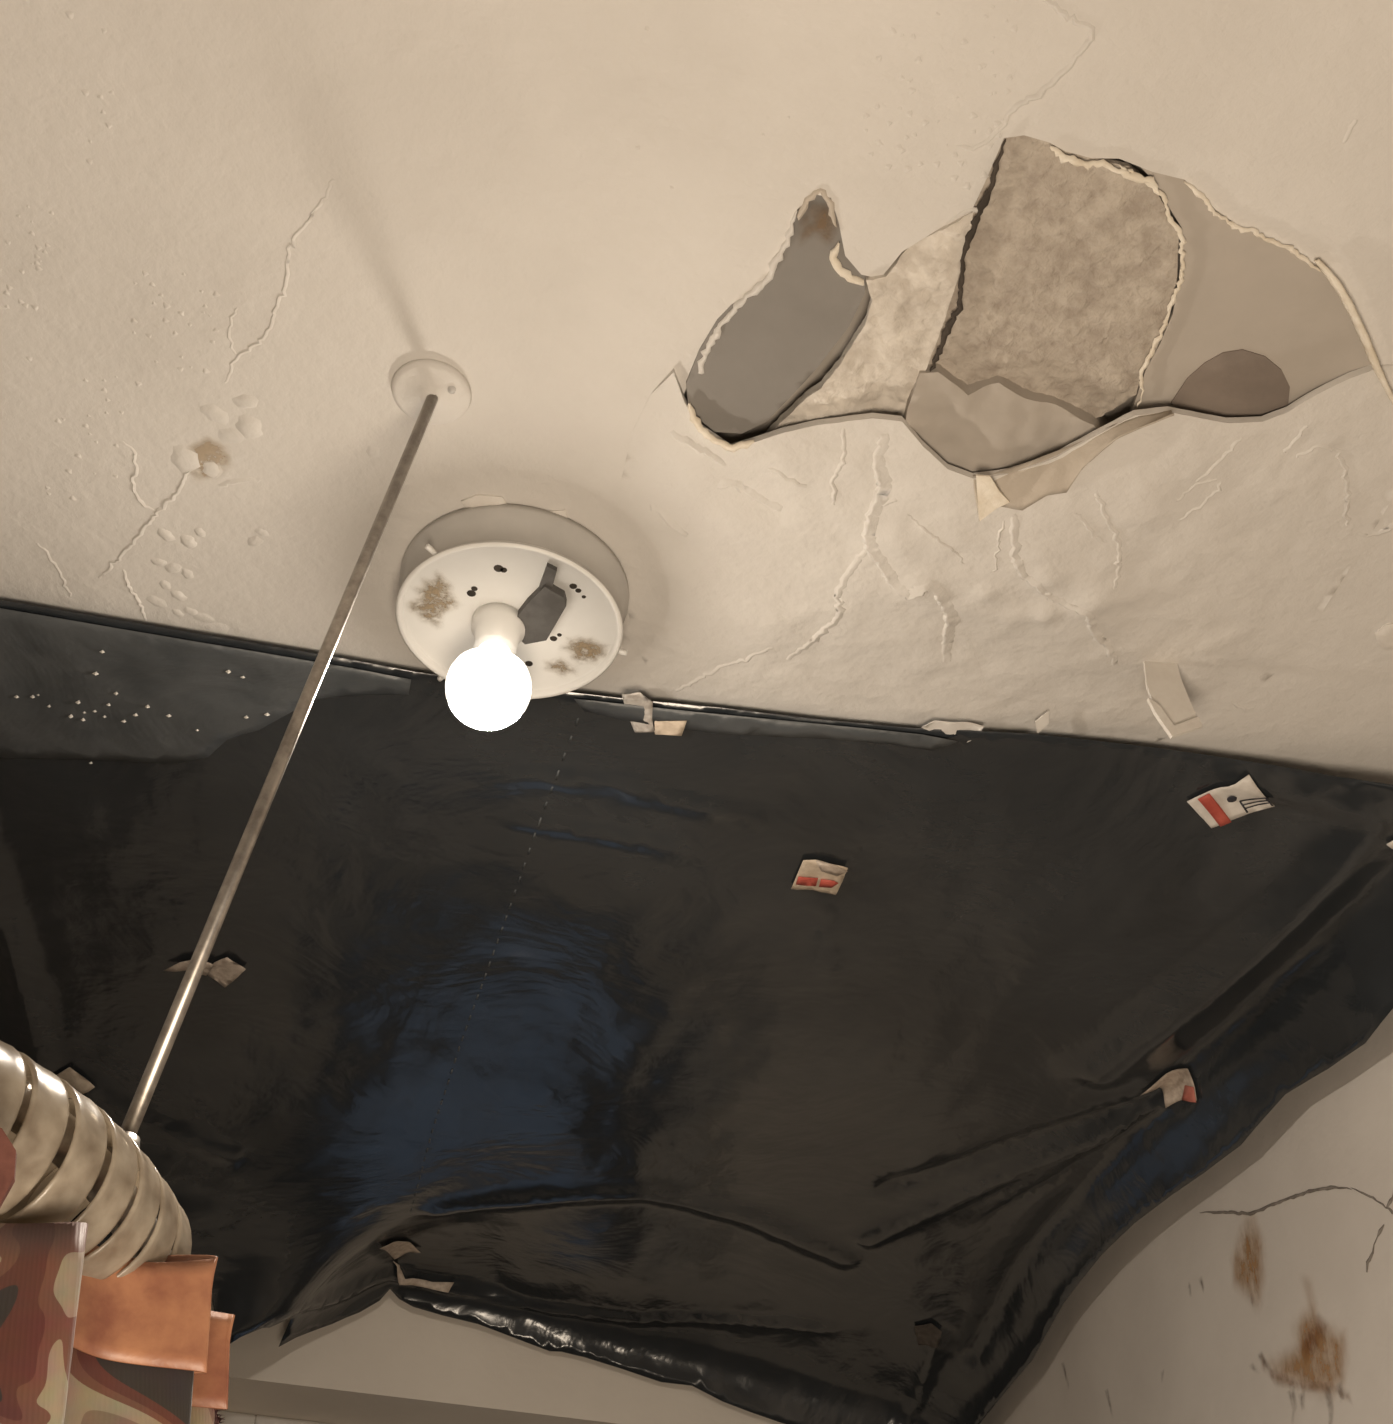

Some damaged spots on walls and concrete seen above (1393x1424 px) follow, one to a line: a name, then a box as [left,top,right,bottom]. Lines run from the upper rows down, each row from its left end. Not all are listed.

crack [224,179,334,383]
flaking render [685,135,1393,521]
crack [36,441,261,621]
crack [670,429,1122,692]
crack [1200,1185,1387,1216]
corrosion [1285,1322,1340,1384]